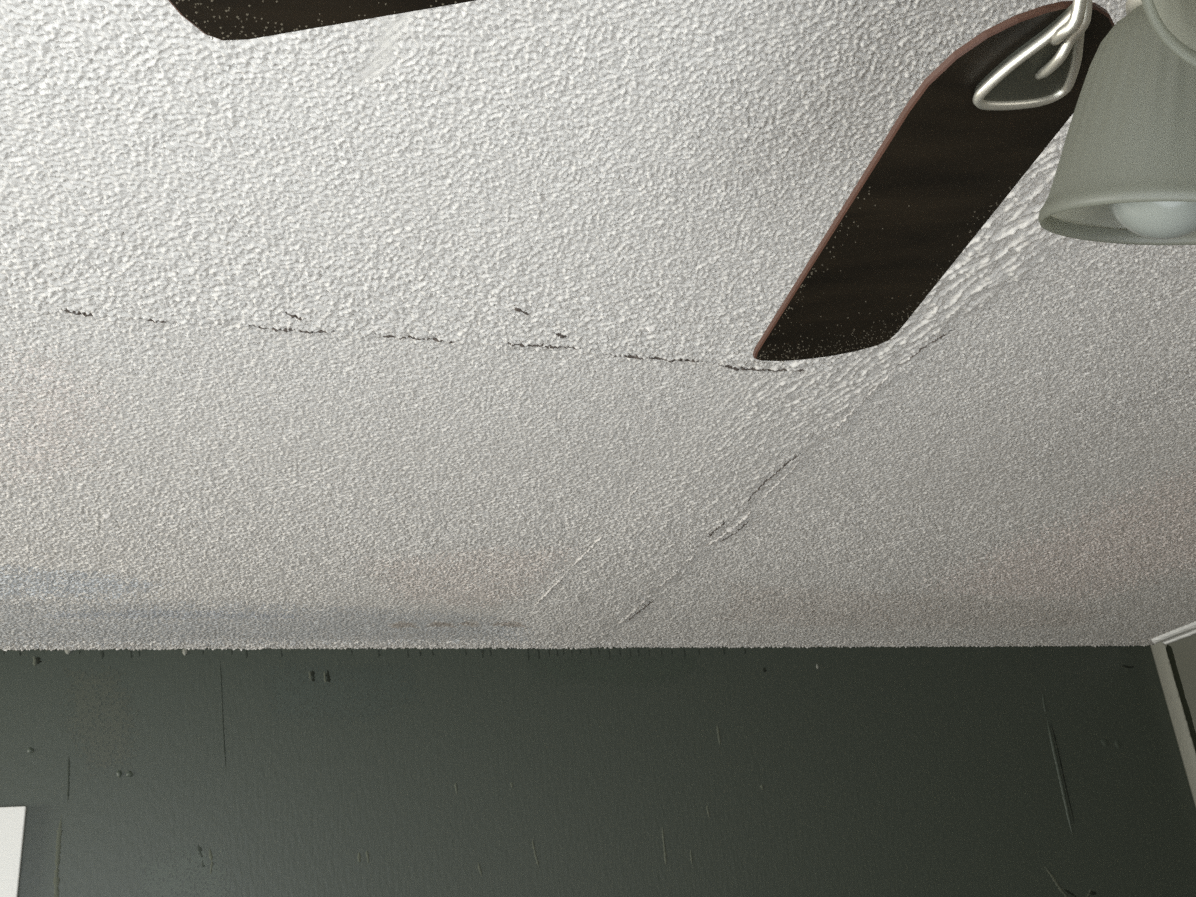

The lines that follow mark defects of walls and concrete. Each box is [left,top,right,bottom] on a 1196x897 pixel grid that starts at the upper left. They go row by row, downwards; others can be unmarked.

crack [61,309,93,317]
crack [246,312,334,334]
crack [383,335,454,344]
crack [502,307,803,372]